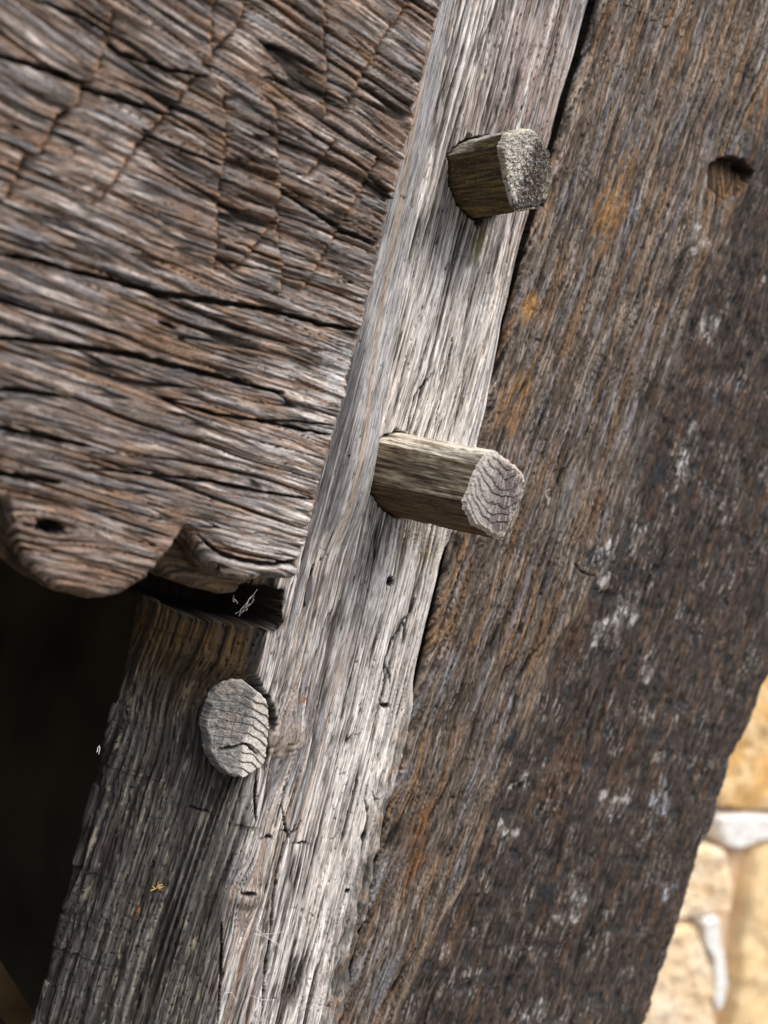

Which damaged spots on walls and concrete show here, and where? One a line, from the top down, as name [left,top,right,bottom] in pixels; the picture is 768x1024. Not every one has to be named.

crack [32,0,207,78]
crack [0,54,220,166]
crack [279,190,377,246]
crack [0,253,355,331]
crack [0,387,68,399]
crack [0,336,281,395]
crack [161,398,333,435]
crack [406,338,452,431]
crack [0,426,311,500]
crack [199,535,313,575]
crack [215,922,223,1024]